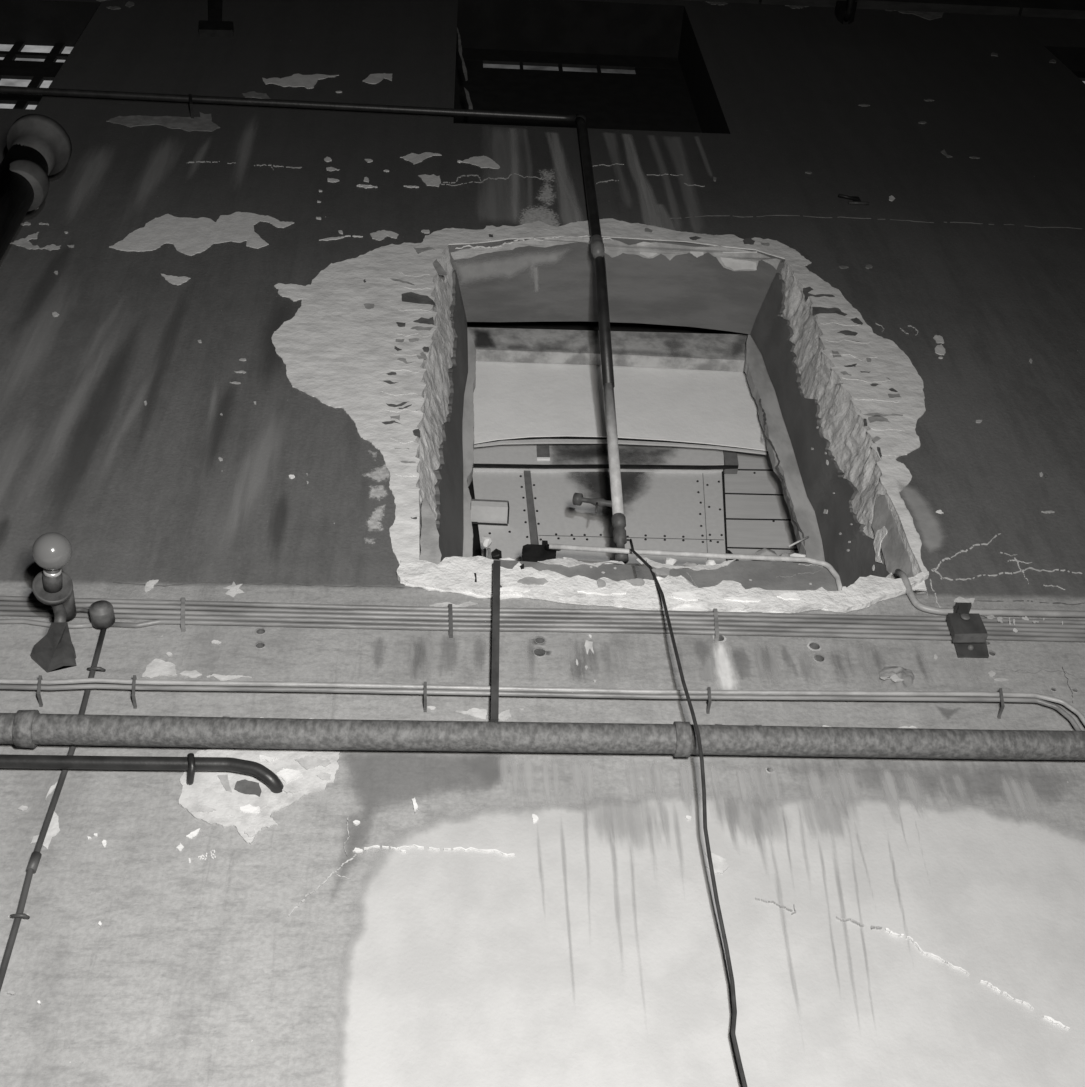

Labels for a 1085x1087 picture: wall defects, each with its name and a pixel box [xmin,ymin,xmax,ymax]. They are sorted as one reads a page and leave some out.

peeling [242,73,339,99]
peeling [363,73,392,84]
peeling [106,112,220,132]
peeling [317,157,340,203]
peeling [109,212,294,256]
spalling [271,218,943,613]
crack [930,533,1083,608]
spalling [176,748,340,851]
crack [288,818,515,917]
crack [755,897,796,915]
crack [836,916,1070,1030]